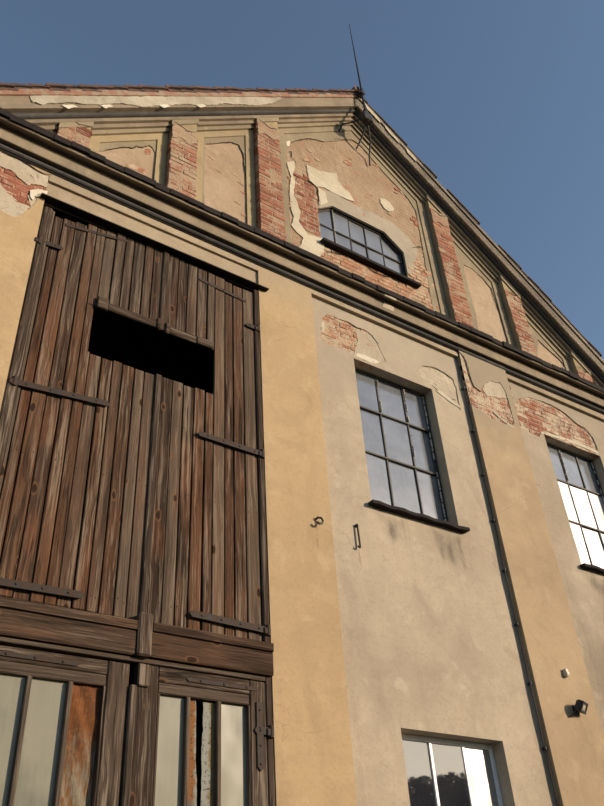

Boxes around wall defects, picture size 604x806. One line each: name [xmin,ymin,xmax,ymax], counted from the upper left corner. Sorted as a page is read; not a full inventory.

spalling [0,152,51,217]
flaking render [56,122,92,148]
peeling [98,145,156,179]
peeling [29,95,283,109]
peeling [165,119,440,312]
flaking render [430,208,507,342]
spalling [321,314,385,370]
flaking render [504,289,564,368]
spalling [416,353,599,458]
rust [59,684,102,806]